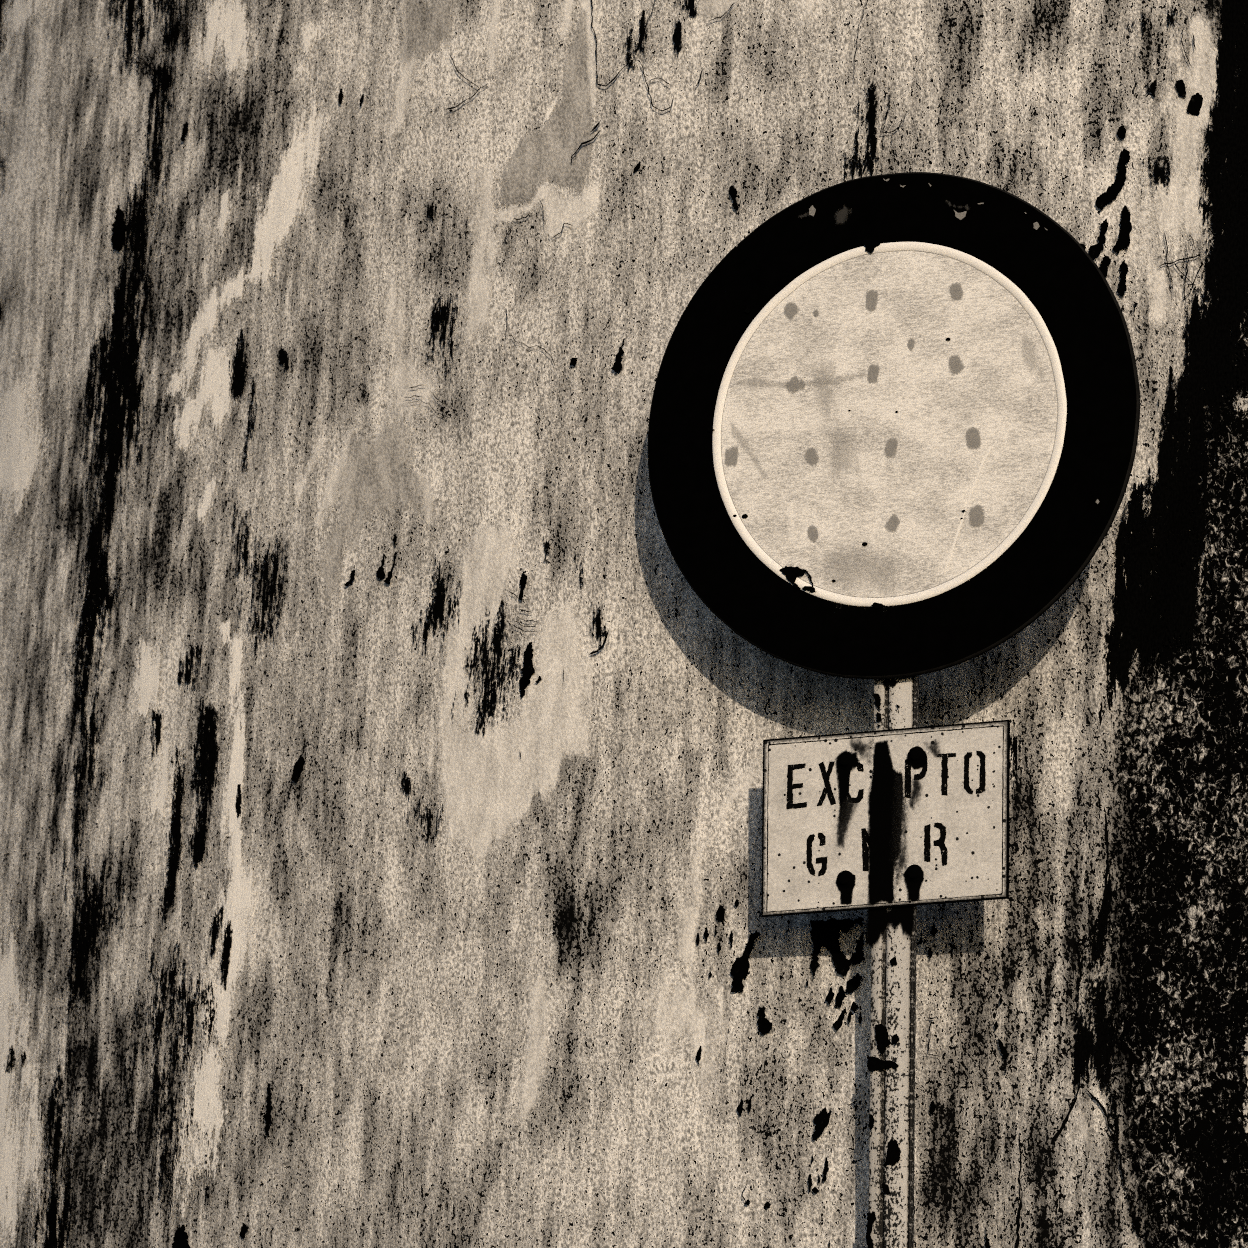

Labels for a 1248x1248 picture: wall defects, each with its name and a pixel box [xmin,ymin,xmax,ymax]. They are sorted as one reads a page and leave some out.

water stain [165,11,335,472]
peeling [461,0,601,345]
peeling [1080,13,1223,326]
water stain [1102,0,1248,727]
water stain [0,0,264,1248]
water stain [123,502,292,1226]
spalling [737,1096,752,1116]
spalling [757,1006,772,1035]
spalling [808,1155,829,1193]
spalling [812,1107,832,1140]
peeling [806,917,865,1031]
water stain [1066,864,1159,1248]